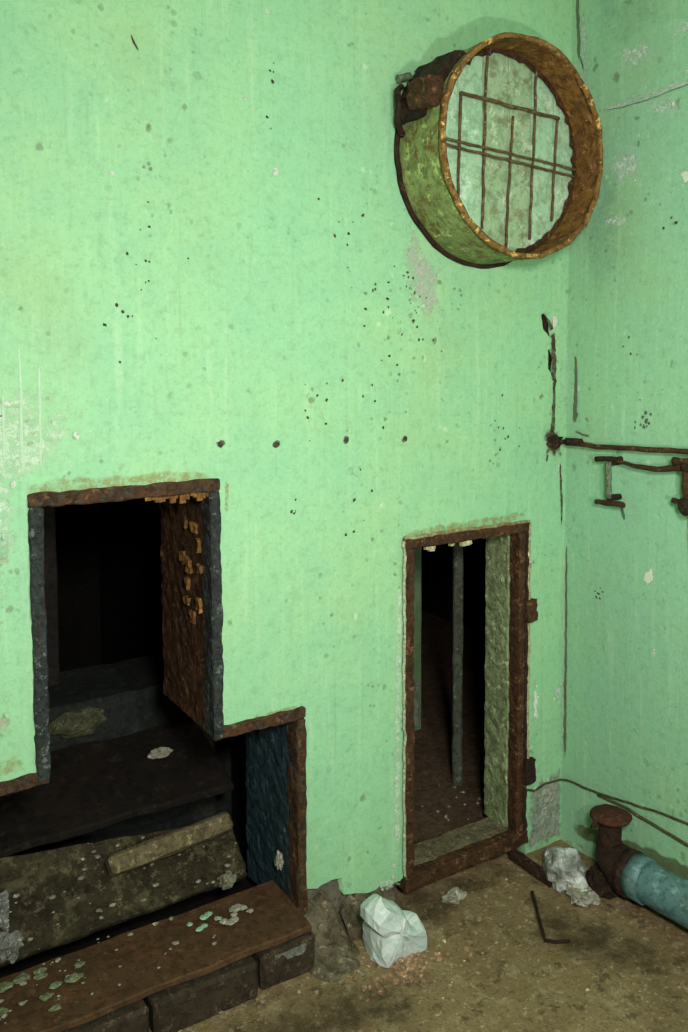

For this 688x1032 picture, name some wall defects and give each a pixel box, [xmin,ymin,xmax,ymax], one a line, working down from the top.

peeling [0,396,79,563]
corrosion [40,473,200,492]